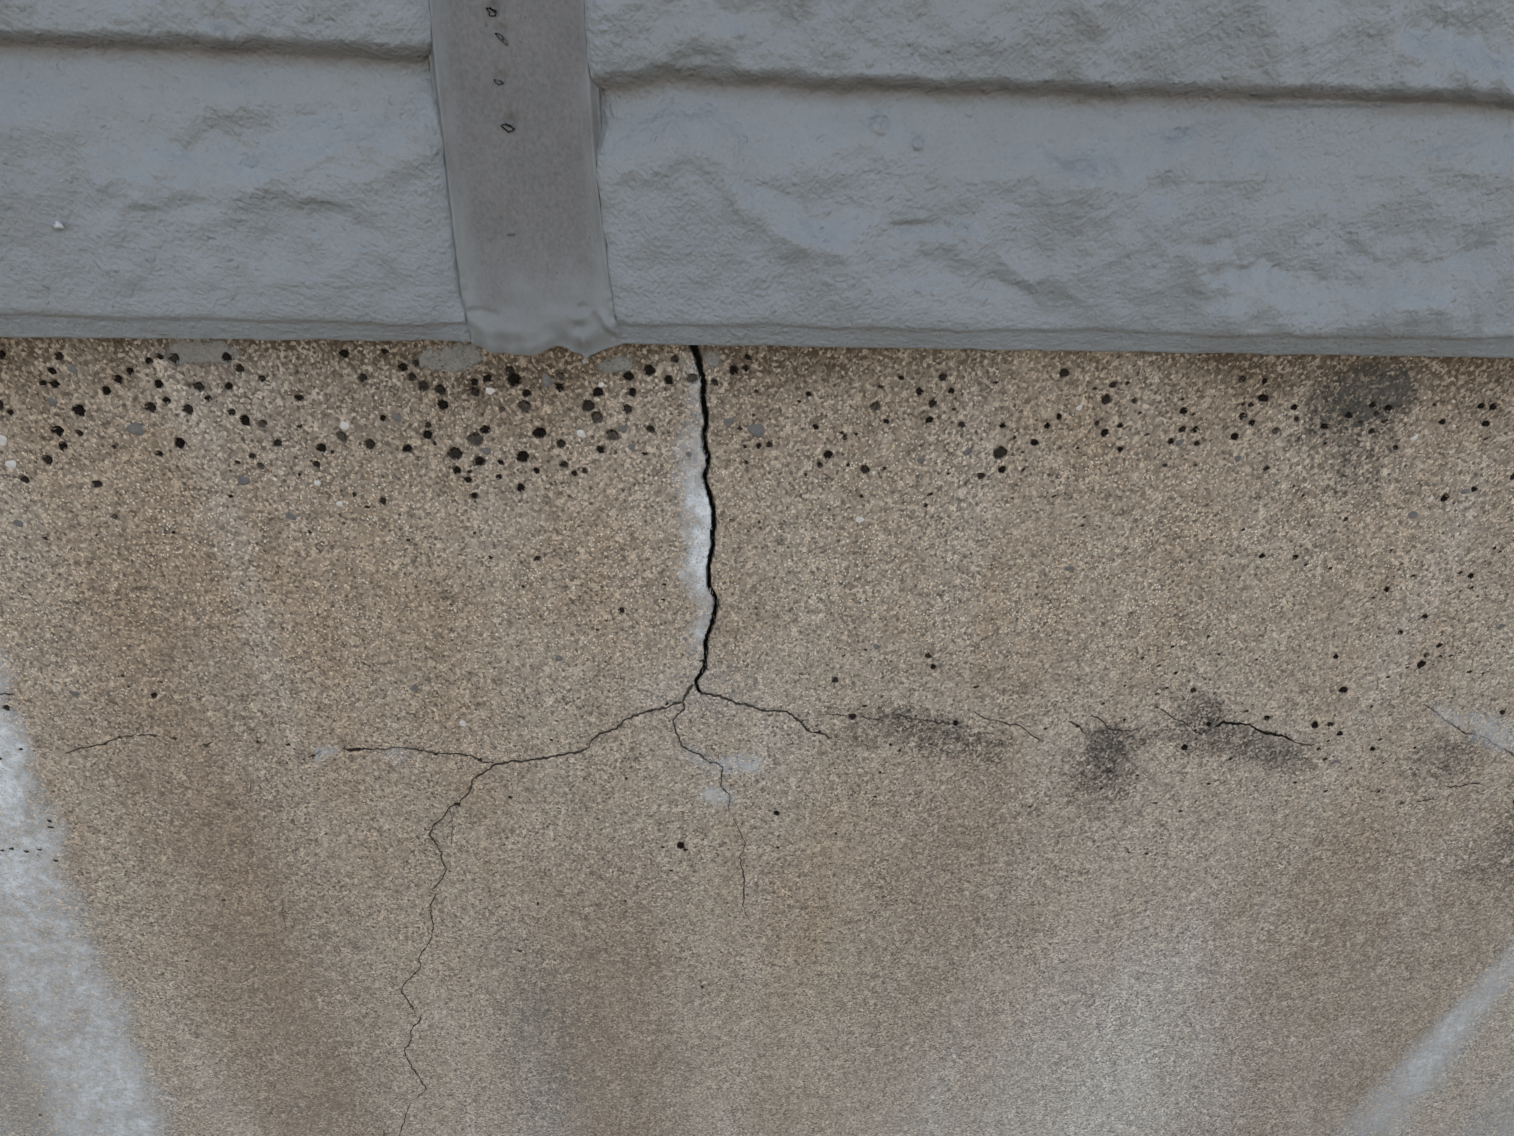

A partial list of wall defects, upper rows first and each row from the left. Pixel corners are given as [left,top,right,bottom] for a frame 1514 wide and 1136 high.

leakage [0,675,165,1136]
crack [65,733,213,754]
crack [310,345,1316,1136]